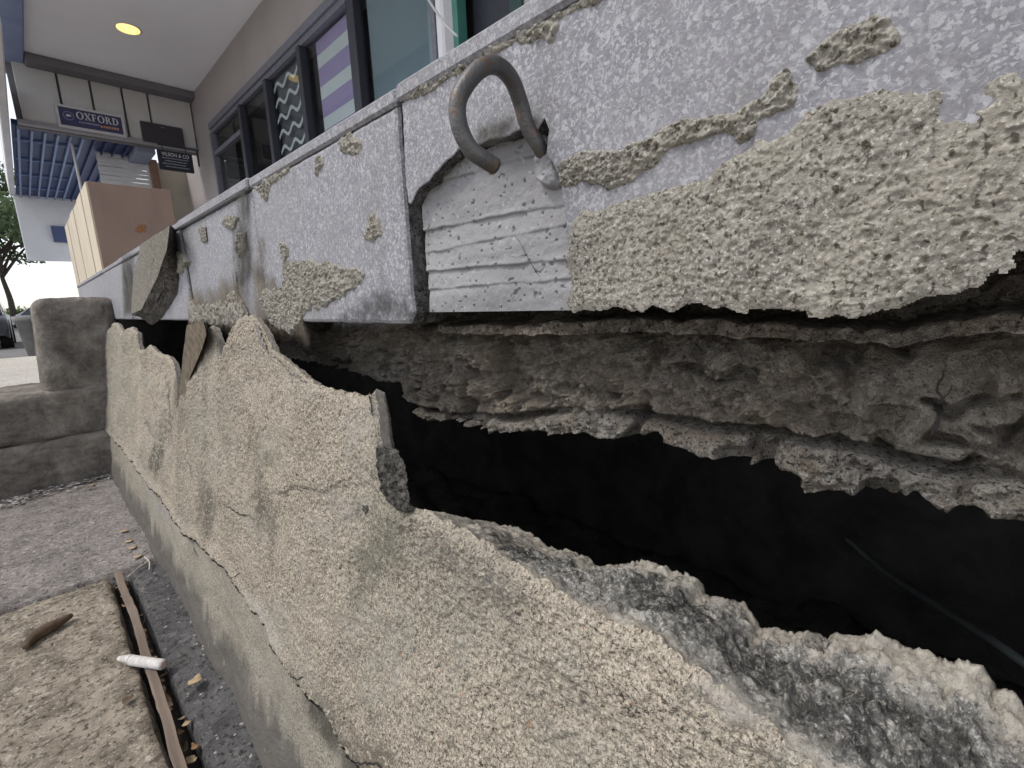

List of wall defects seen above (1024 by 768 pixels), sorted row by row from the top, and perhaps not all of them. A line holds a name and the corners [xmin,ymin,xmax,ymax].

spalling [253,135,1024,521]
crack [929,368,953,437]
crack [115,442,382,768]